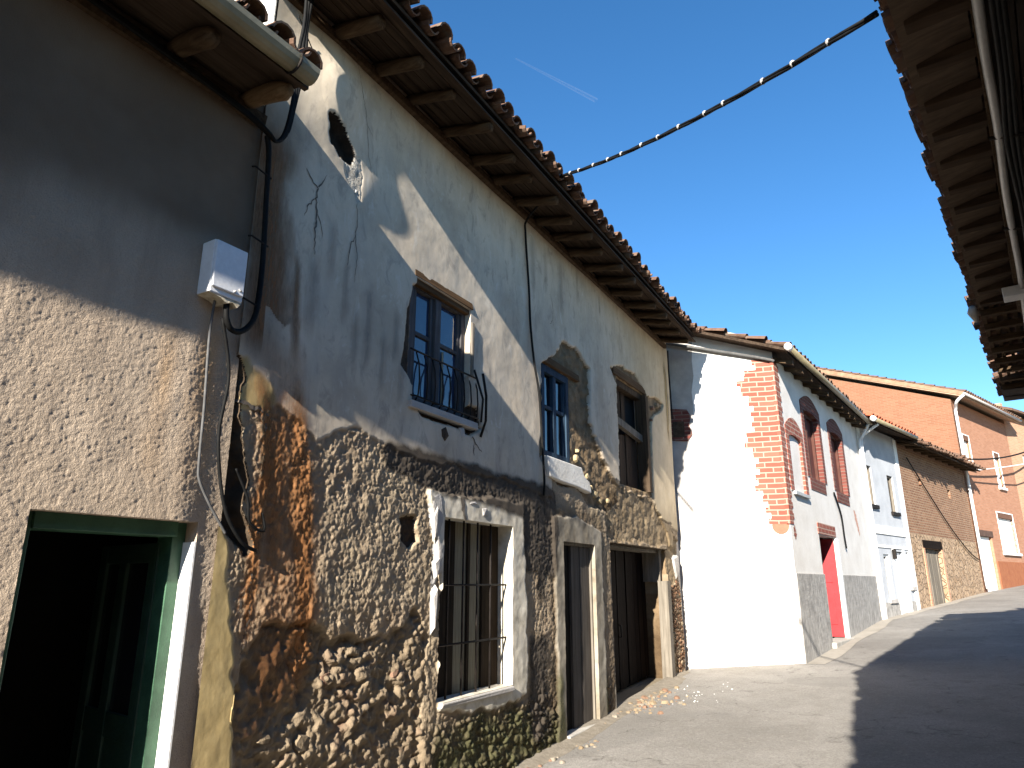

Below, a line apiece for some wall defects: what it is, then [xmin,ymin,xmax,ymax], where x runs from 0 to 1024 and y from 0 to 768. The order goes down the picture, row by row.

crack [304,169,327,251]
spalling [328,112,363,204]
crack [347,72,374,282]
flaking render [400,285,413,374]
flaking render [419,406,479,441]
flaking render [648,397,693,442]
flaking render [461,497,487,520]
flaking render [549,342,686,673]
flaking render [230,494,444,768]